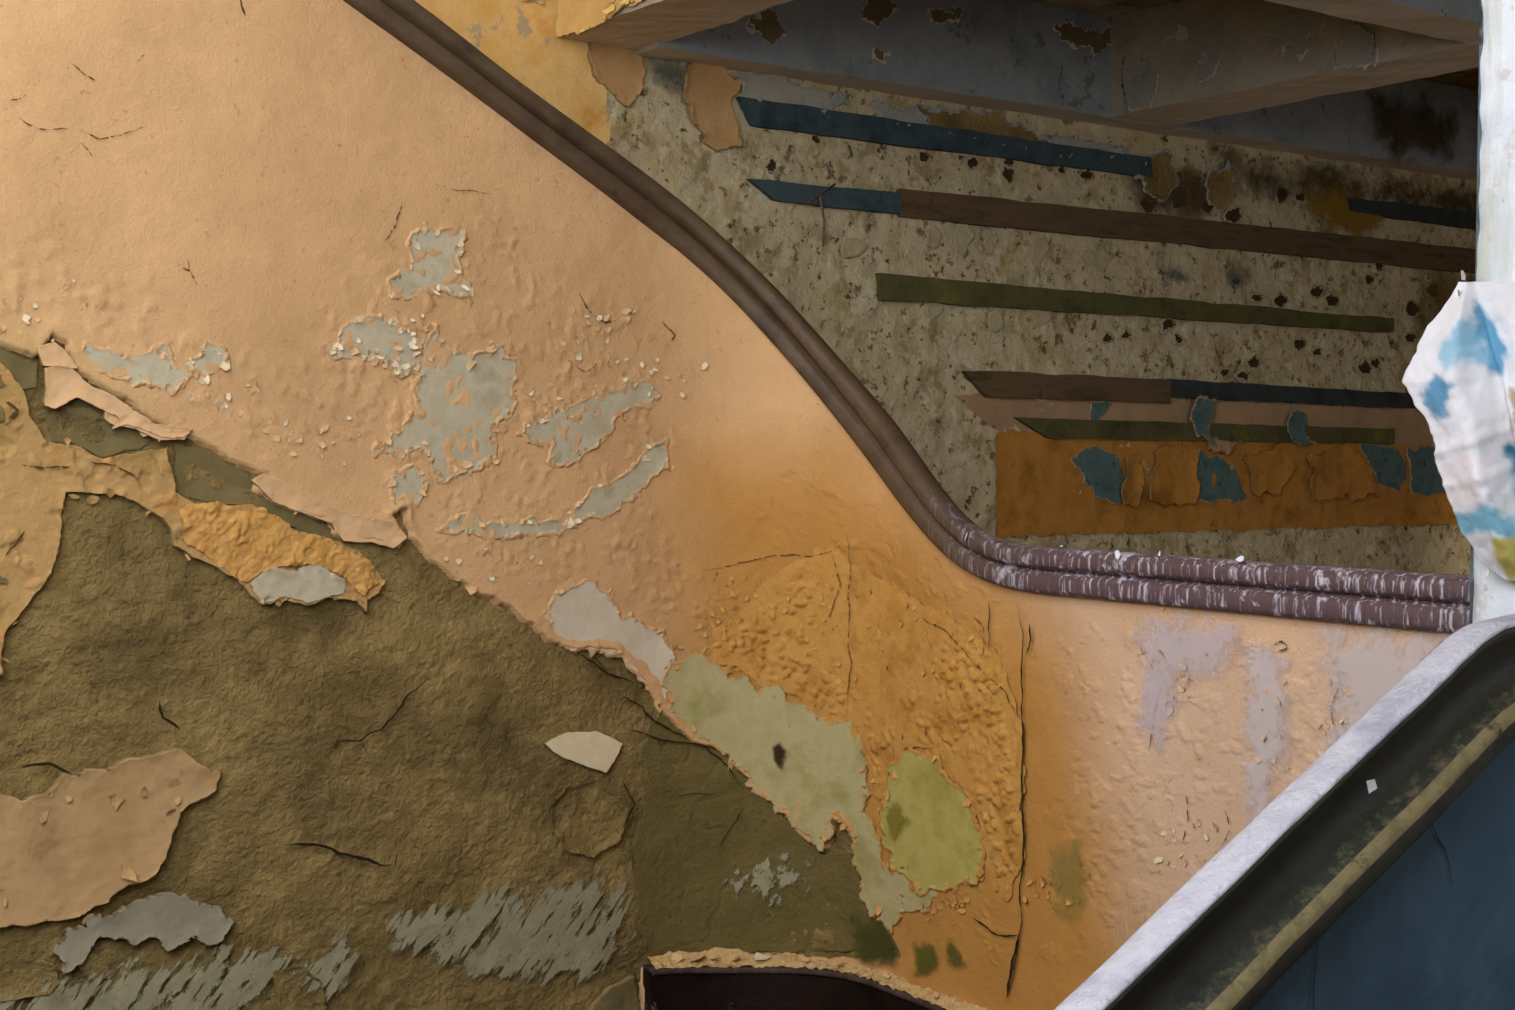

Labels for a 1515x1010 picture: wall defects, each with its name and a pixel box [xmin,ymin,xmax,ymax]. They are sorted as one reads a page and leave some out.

flaking render [580,0,646,107]
spalling [745,8,787,45]
spalling [861,0,899,28]
flaking render [763,155,779,174]
flaking render [1230,276,1339,310]
flaking render [1356,355,1381,377]
peeling [1360,270,1515,582]
flaking render [0,221,993,1010]
damp [1140,617,1290,819]
crack [914,609,1031,998]